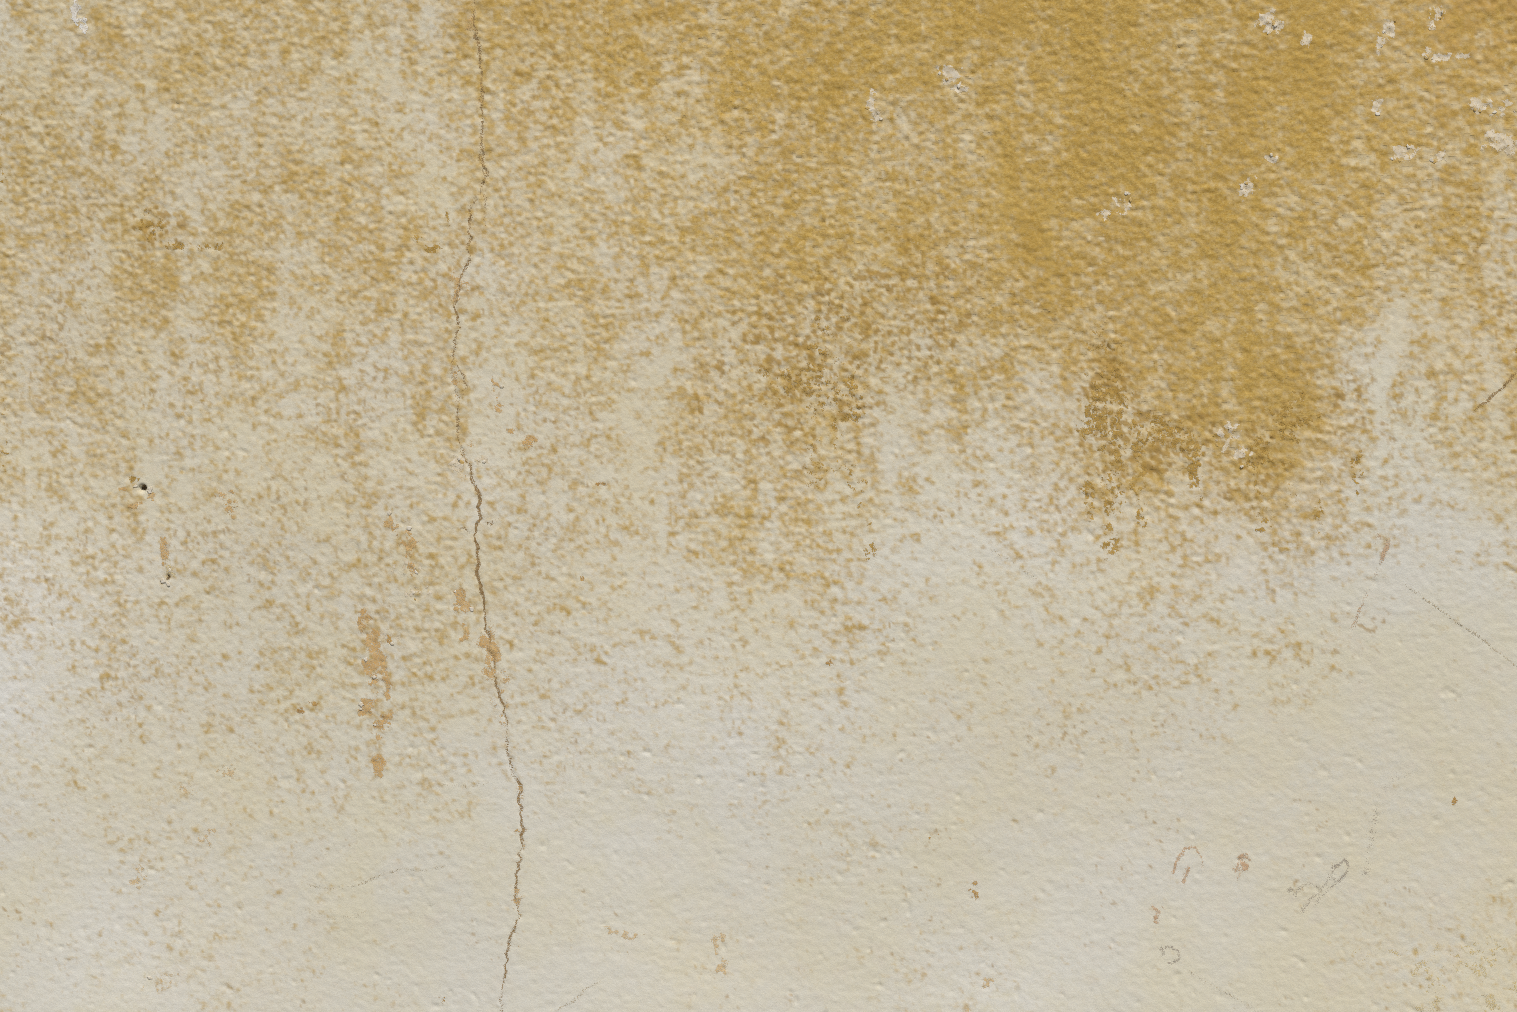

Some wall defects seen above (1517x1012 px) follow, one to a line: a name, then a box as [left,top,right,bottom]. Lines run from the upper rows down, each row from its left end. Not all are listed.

damp [138,208,223,261]
damp [413,234,442,253]
crack [1475,348,1517,412]
damp [759,302,877,560]
damp [1074,323,1208,561]
damp [1246,384,1321,533]
damp [118,476,155,510]
crack [443,0,527,1011]
damp [160,537,176,577]